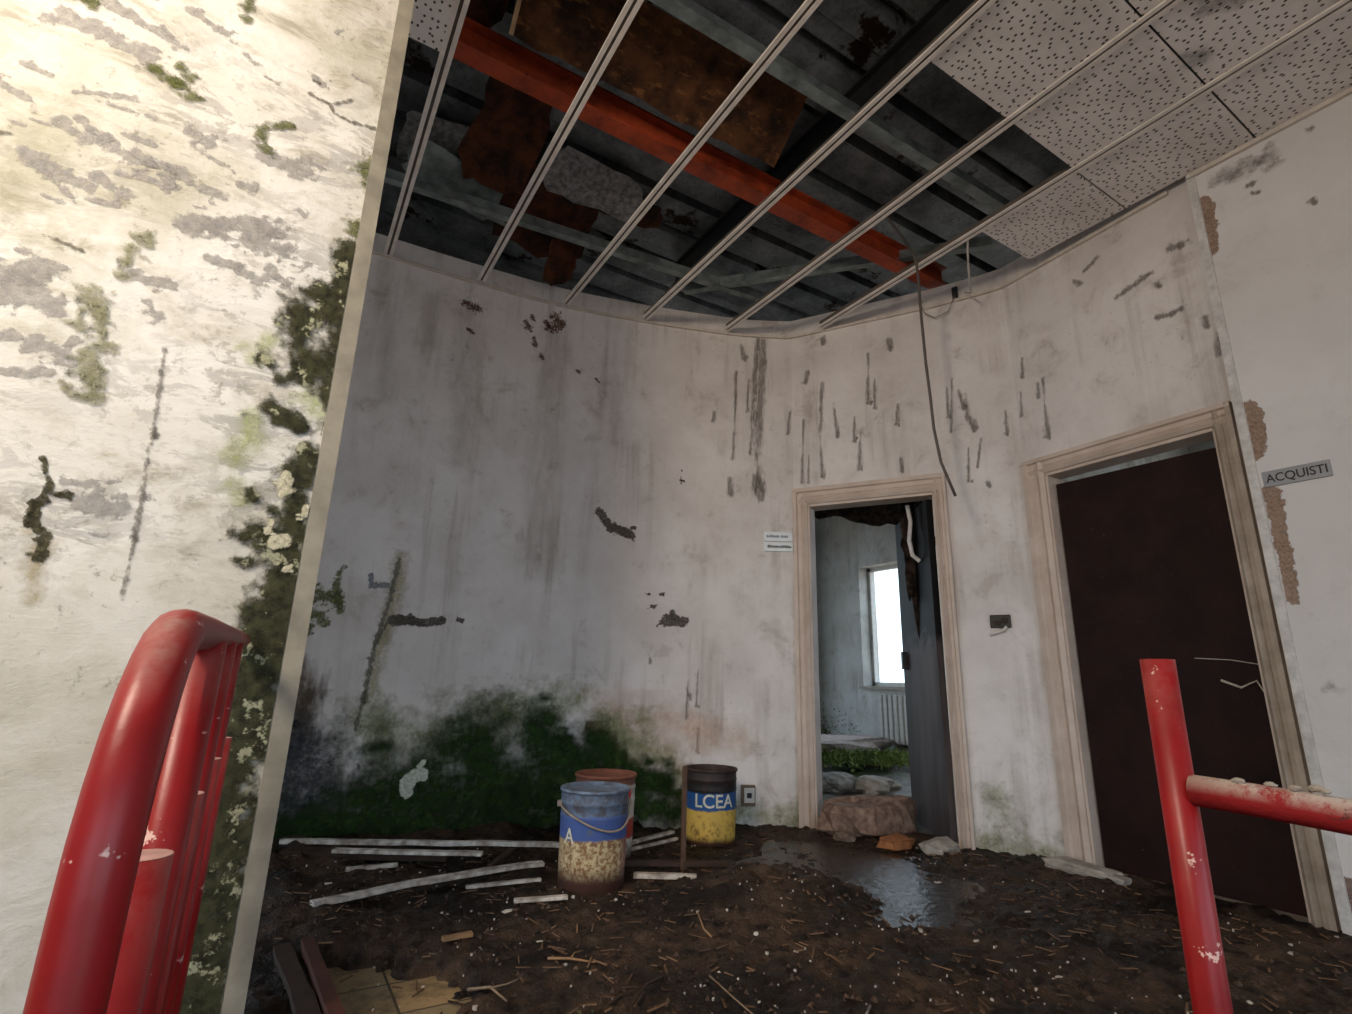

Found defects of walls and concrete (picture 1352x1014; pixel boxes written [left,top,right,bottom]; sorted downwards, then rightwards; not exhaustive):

peeling [38,0,189,69]
peeling [185,6,280,85]
peeling [252,140,325,181]
peeling [11,114,313,288]
peeling [1200,196,1220,257]
peeling [0,247,84,382]
peeling [125,268,177,324]
leakage [732,341,766,458]
peeling [1243,400,1268,461]
flaking render [595,507,637,542]
peeling [1262,486,1300,605]
leakage [277,660,347,825]